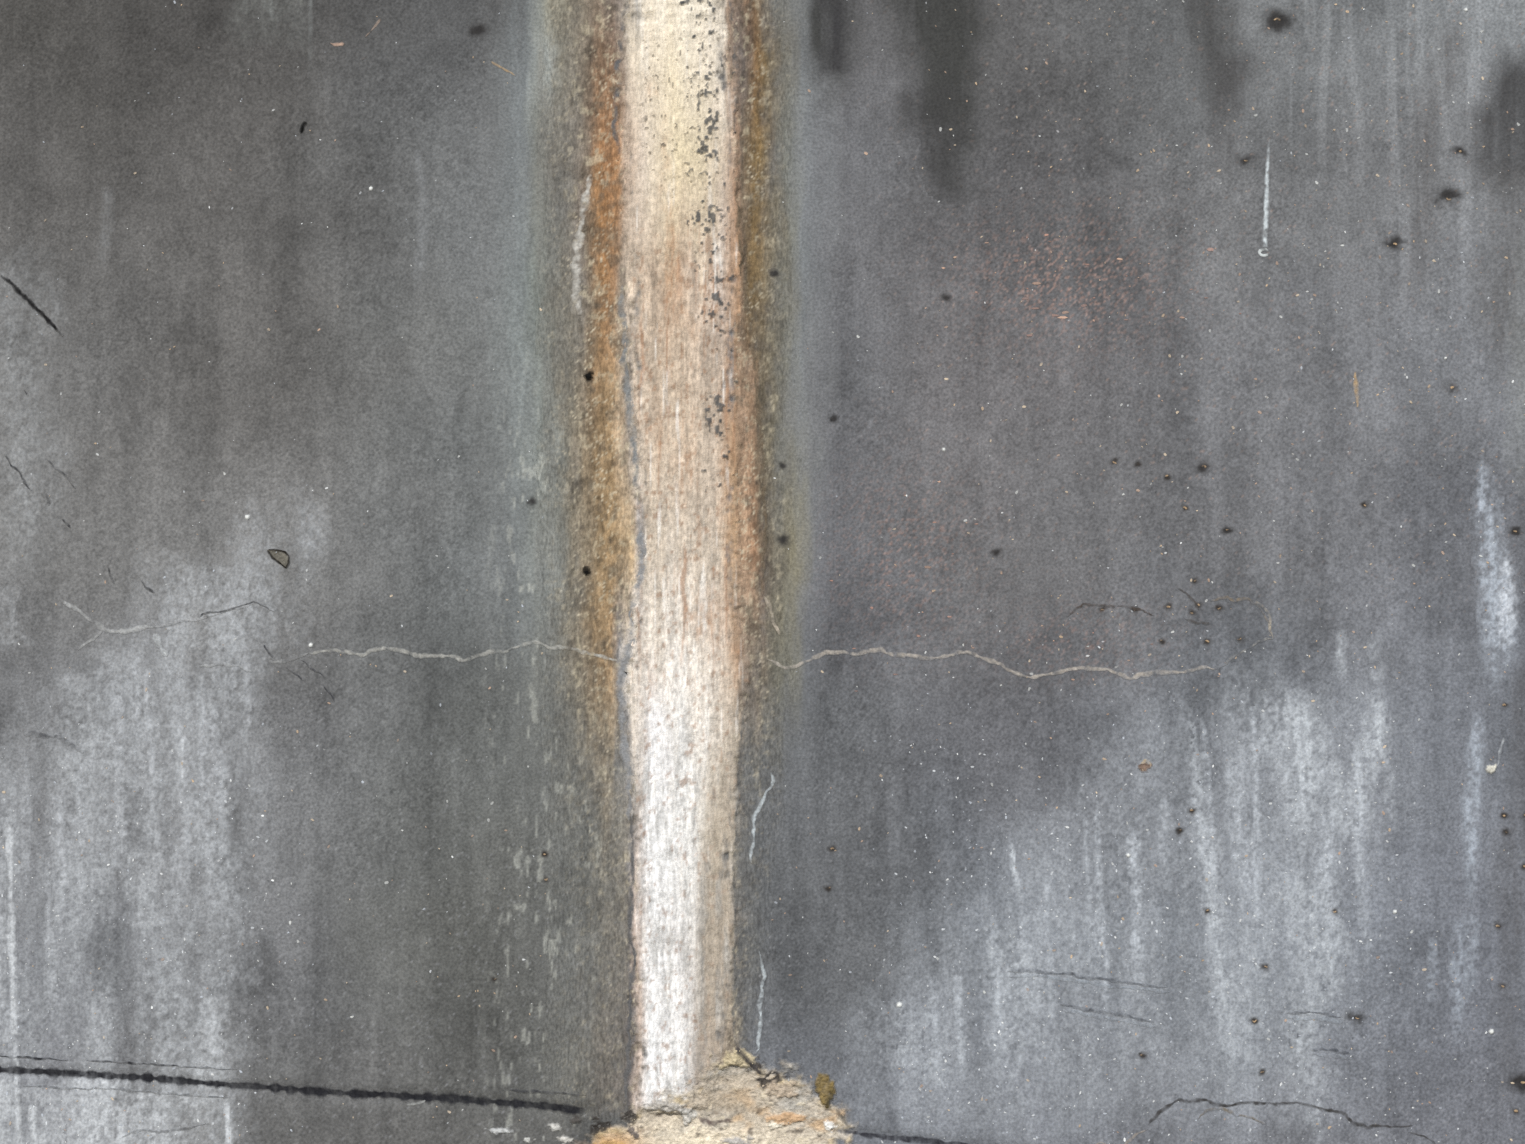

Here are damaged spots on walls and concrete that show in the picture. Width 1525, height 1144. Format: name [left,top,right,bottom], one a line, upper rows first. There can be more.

water stain [1153,0,1301,257]
crack [59,567,618,701]
corrosion [532,0,645,1122]
corrosion [724,0,803,1055]
water stain [610,0,1009,1114]
crack [763,588,1274,680]
water stain [1190,455,1213,476]
water stain [1217,523,1235,536]
water stain [1380,18,1525,1122]
water stain [834,629,1426,1144]
spalling [484,1045,860,1144]